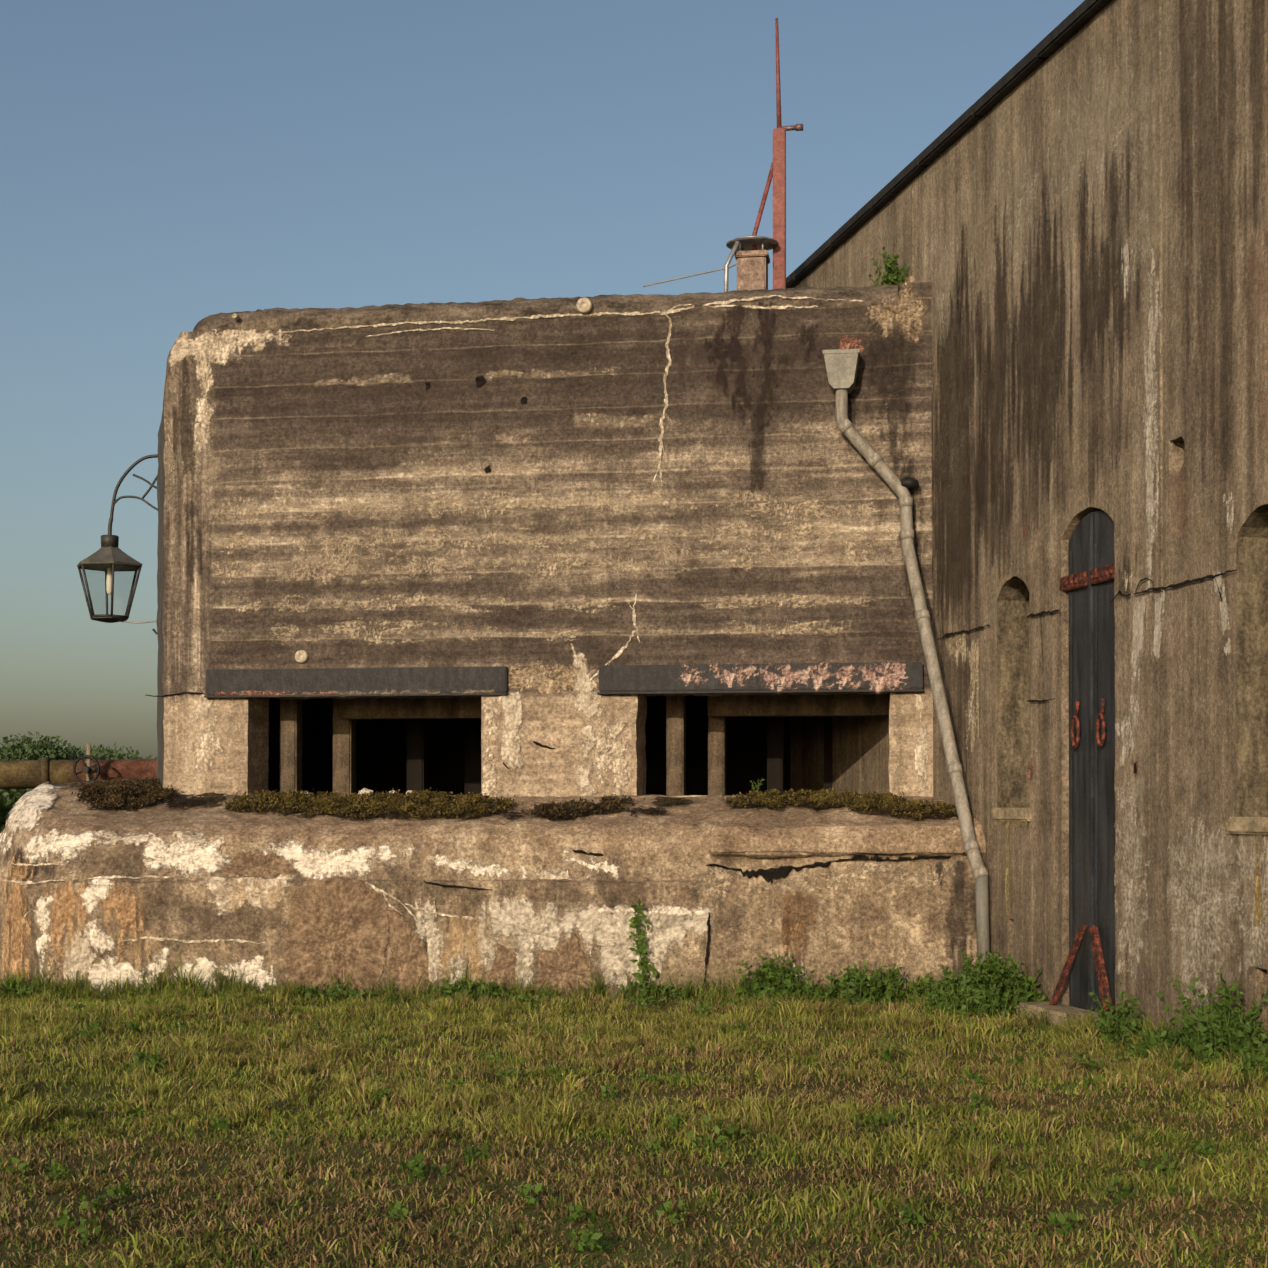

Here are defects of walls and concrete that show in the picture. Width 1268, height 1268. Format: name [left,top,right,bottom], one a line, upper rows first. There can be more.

crack [277,295,864,486]
damp [704,301,822,492]
damp [848,390,867,427]
damp [867,125,1165,681]
crack [584,594,640,687]
peeling [679,662,908,692]
crack [937,624,990,640]
crack [1111,569,1237,602]
damp [1214,572,1231,654]
damp [1115,695,1139,765]
spalling [0,781,432,999]
crack [706,852,965,884]